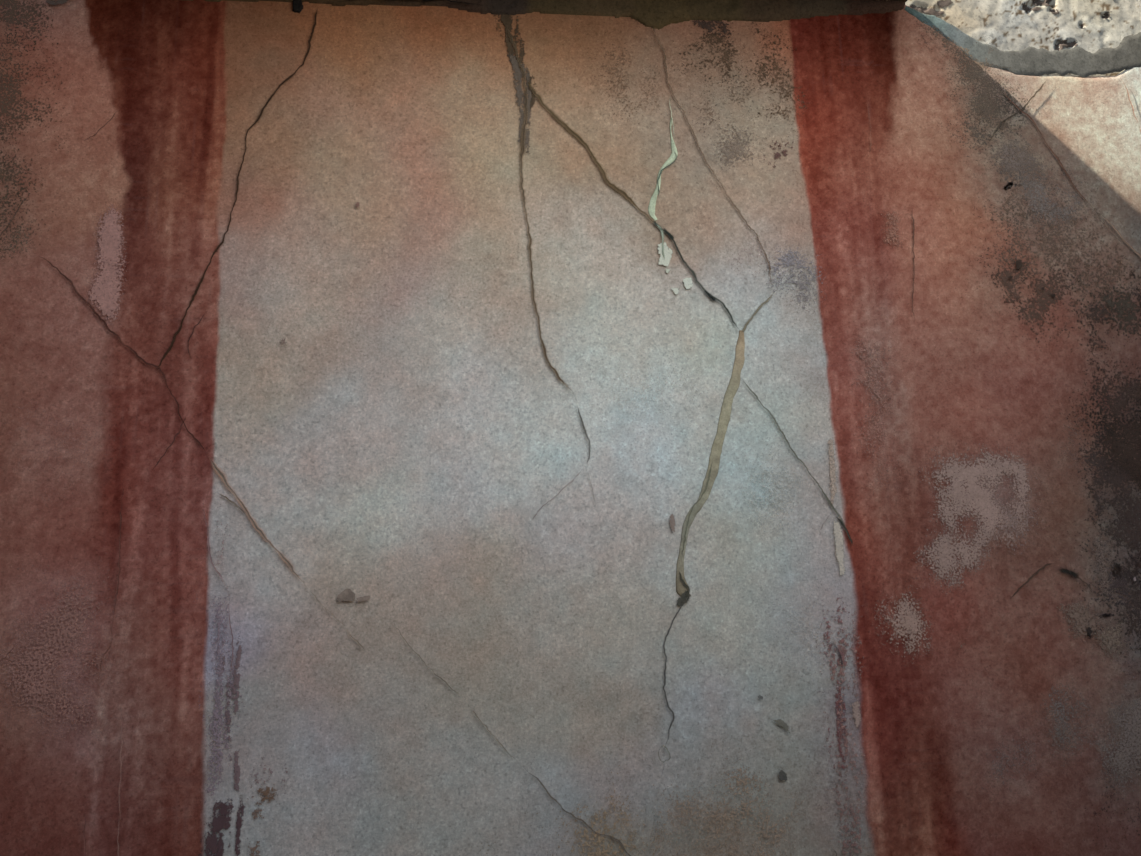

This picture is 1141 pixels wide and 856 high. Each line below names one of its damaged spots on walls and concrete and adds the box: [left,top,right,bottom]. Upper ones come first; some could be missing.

water stain [0,0,67,260]
crack [45,11,317,612]
crack [508,28,772,517]
crack [745,383,853,544]
mould [914,7,1141,686]
crack [658,603,682,763]
crack [532,775,630,856]